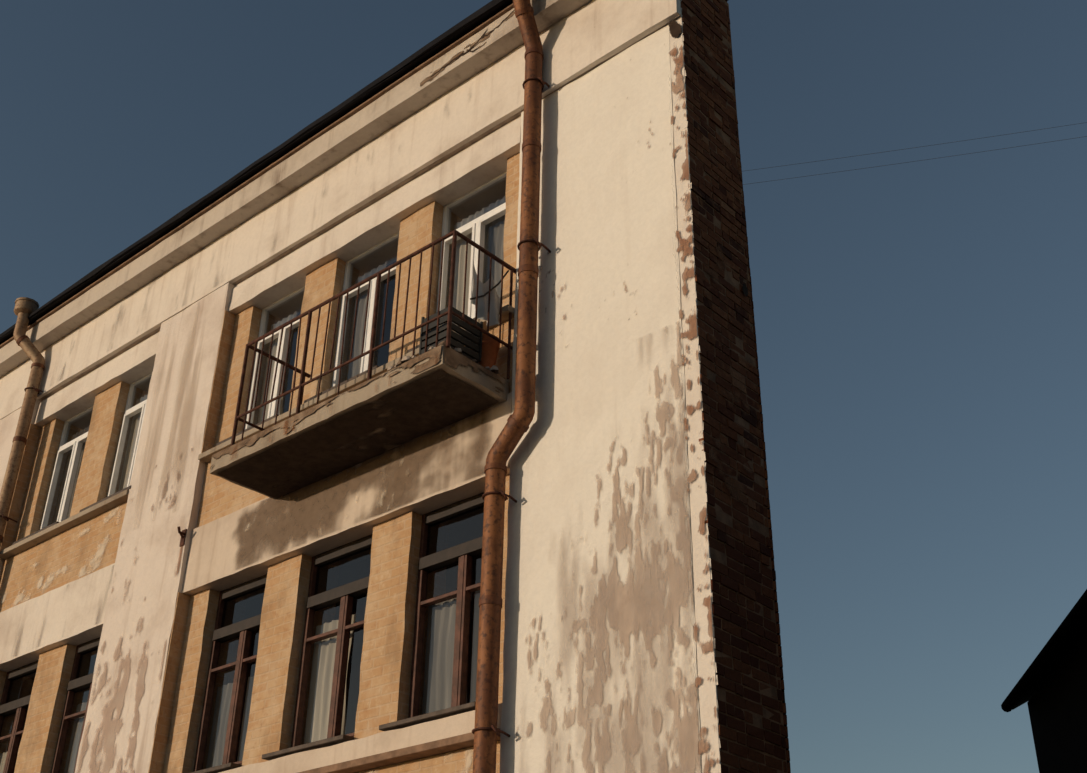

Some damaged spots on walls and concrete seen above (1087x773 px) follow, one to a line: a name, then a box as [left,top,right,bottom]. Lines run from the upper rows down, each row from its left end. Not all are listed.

flaking render [669,20,694,296]
spalling [210,345,506,469]
peeling [151,473,180,510]
peeling [517,309,719,773]
peeling [77,619,147,773]